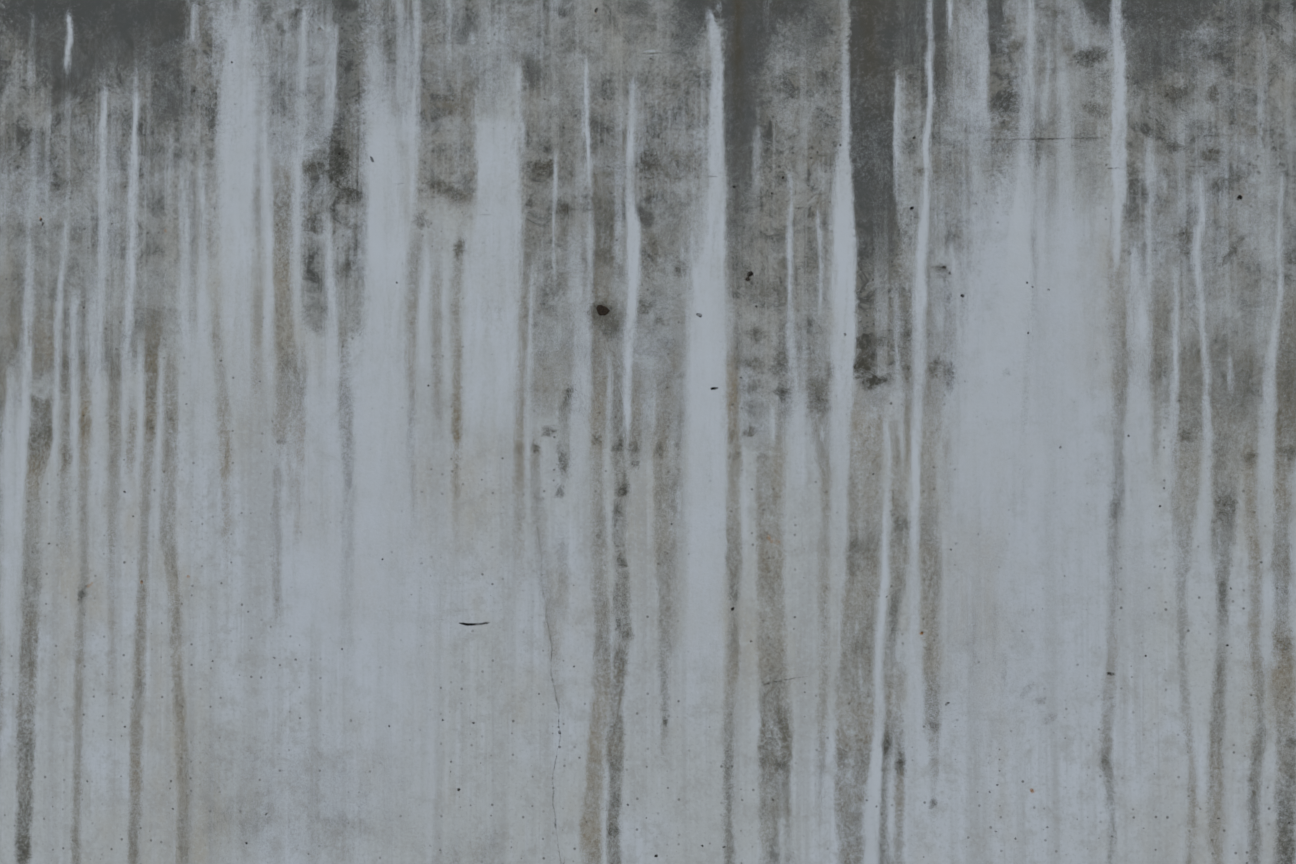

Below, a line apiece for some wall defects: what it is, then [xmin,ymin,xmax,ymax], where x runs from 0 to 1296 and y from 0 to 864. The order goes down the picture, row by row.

water stain [0,0,657,864]
water stain [648,0,1296,864]